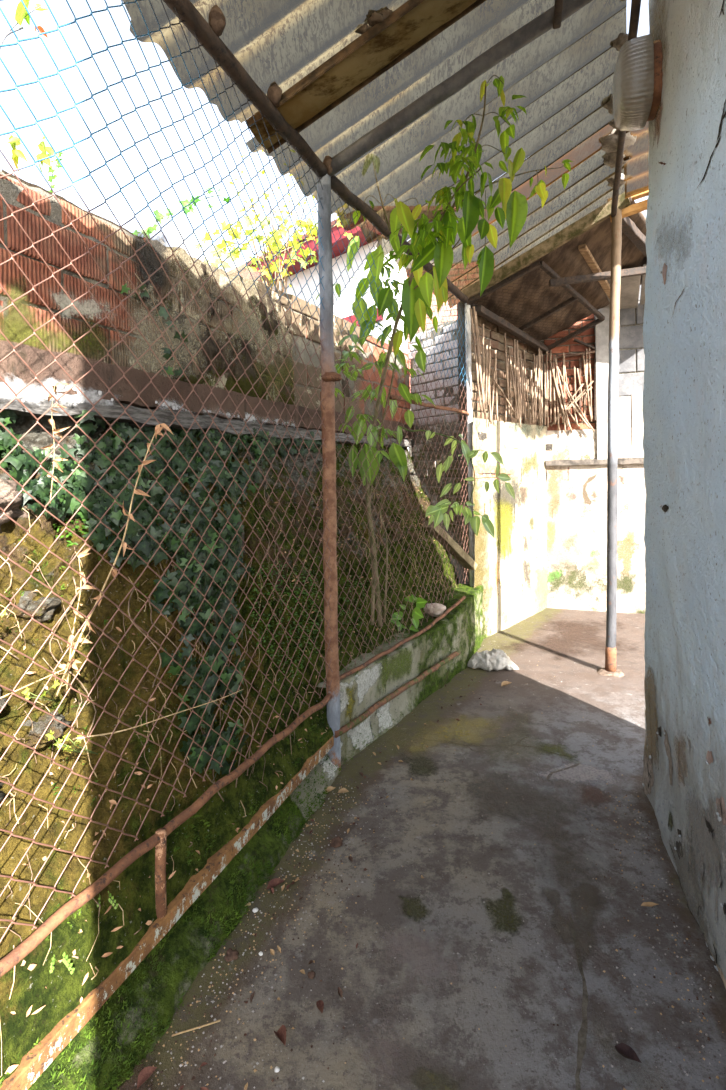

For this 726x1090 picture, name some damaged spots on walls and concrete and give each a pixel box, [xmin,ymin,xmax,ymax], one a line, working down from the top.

crack [682,100,726,186]
leakage [484,468,528,518]
leakage [537,450,569,518]
leakage [582,475,597,505]
leakage [522,518,534,596]
spalling [547,545,604,582]
leakage [548,566,636,600]
spalling [617,539,634,575]